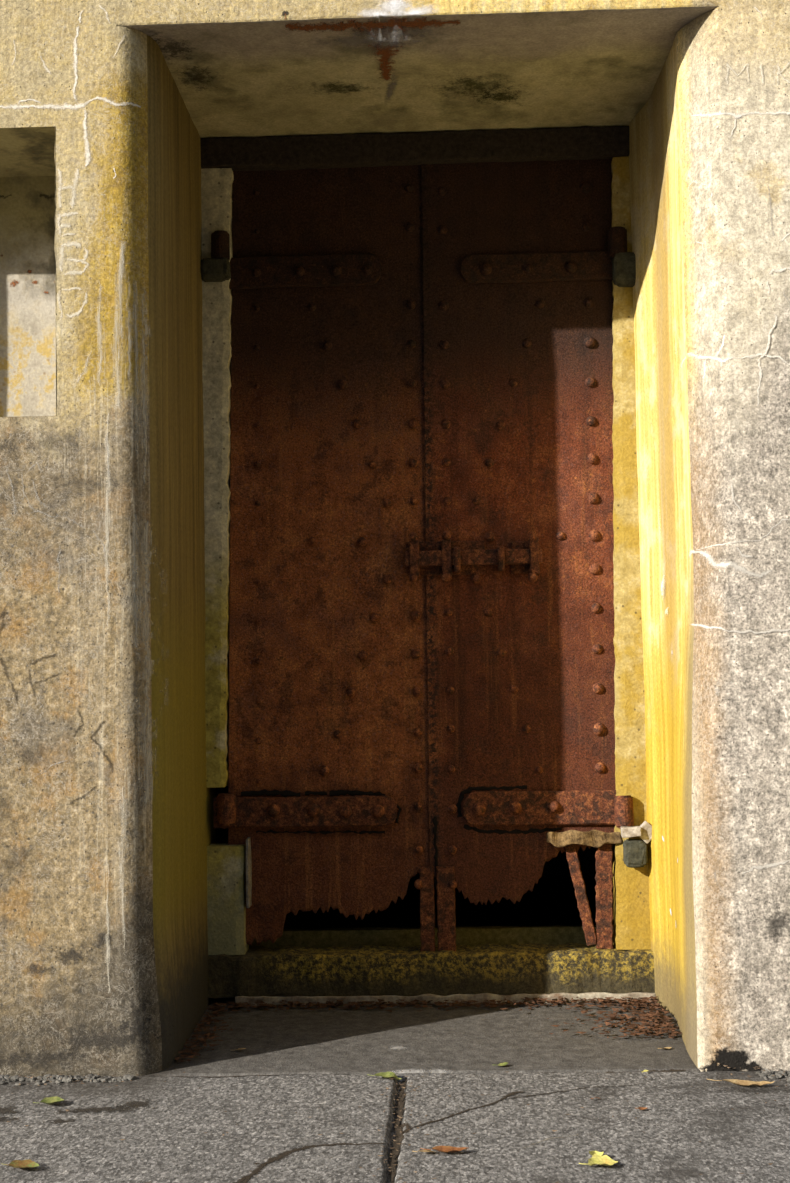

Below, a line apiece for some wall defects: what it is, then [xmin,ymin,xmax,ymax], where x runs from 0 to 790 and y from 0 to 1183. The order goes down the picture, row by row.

corrosion [282,11,460,80]
crack [0,6,140,178]
crack [693,111,790,135]
crack [681,233,790,404]
crack [689,518,790,578]
crack [691,624,790,634]
corrosion [241,789,385,797]
corrosion [456,785,562,834]
crack [233,1085,634,1183]